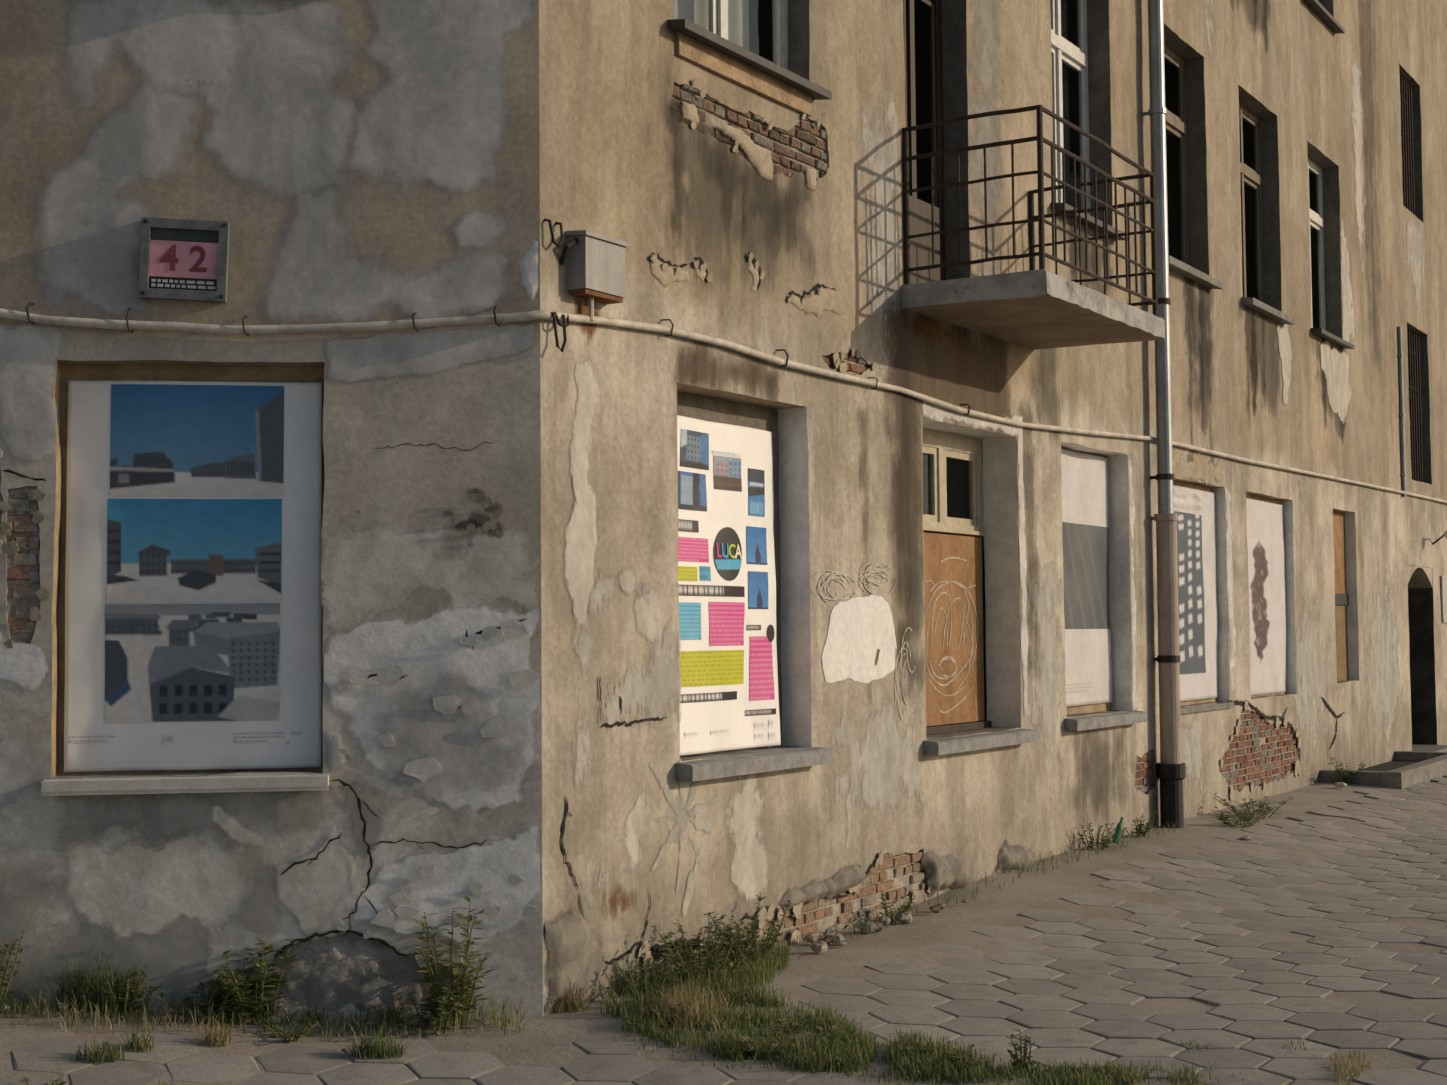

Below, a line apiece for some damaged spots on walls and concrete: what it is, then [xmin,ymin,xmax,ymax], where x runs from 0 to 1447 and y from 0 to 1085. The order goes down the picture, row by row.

damp [671,107,798,276]
spalling [670,78,830,191]
damp [1186,280,1212,462]
peeling [1320,221,1355,423]
peeling [321,489,541,817]
crack [599,677,666,728]
spalling [1172,450,1327,810]
crack [1216,696,1345,756]
crack [274,779,487,967]
crack [561,795,584,918]
crack [605,853,888,972]
spalling [638,774,930,974]